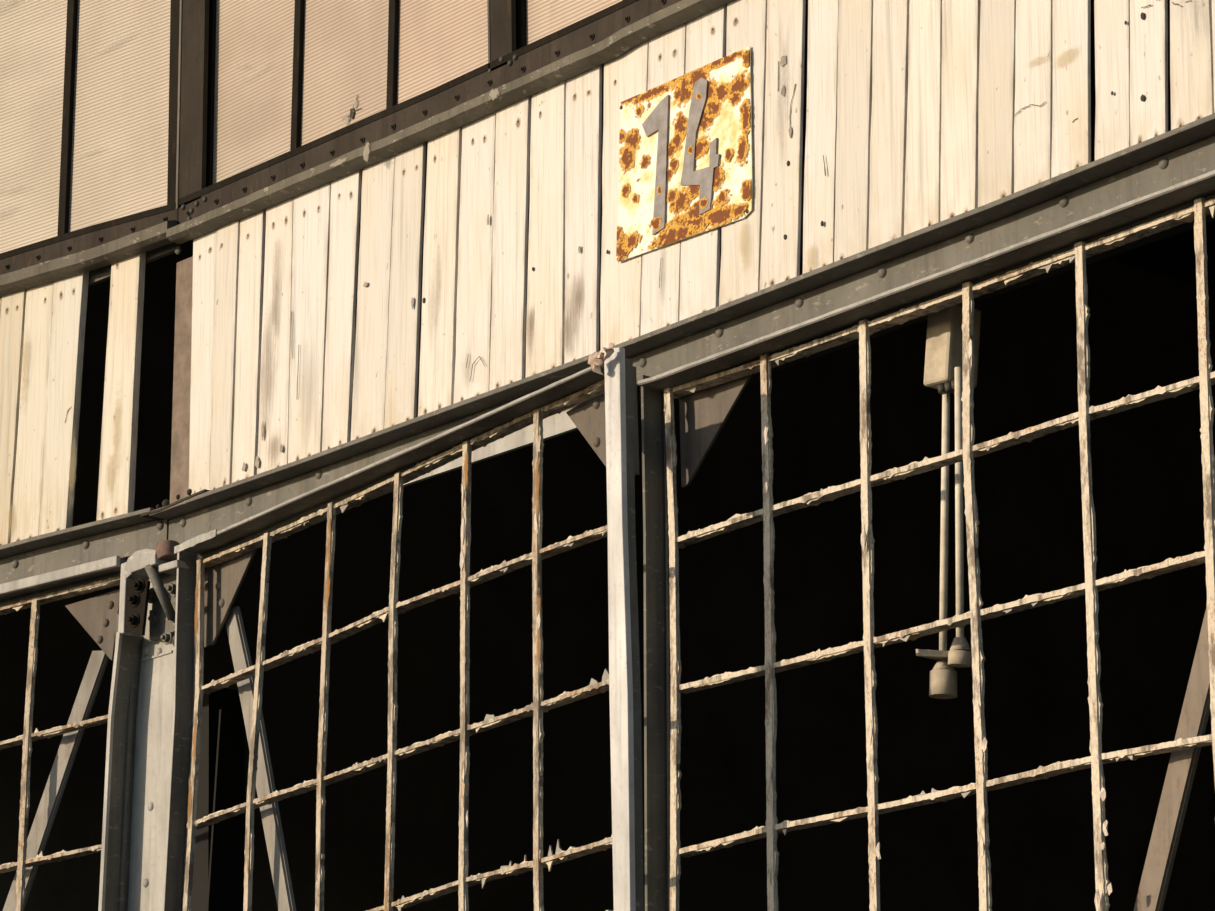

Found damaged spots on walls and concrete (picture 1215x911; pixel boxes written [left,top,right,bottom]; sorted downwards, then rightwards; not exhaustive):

corrosion [616,49,751,262]
peeling [1100,820,1109,850]
peeling [1094,883,1113,911]